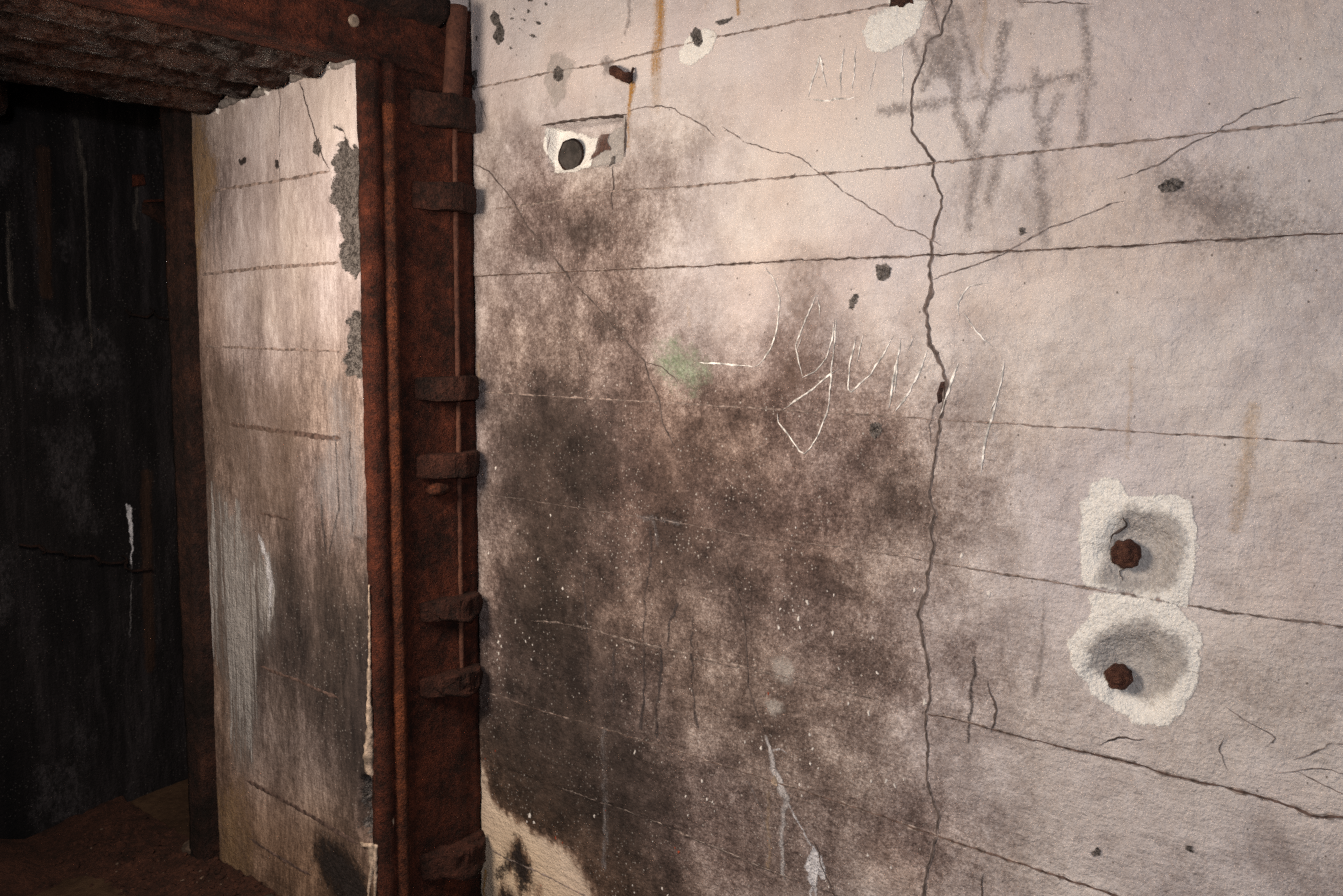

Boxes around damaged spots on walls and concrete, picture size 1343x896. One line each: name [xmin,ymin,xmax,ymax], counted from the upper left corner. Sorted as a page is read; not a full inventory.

corrosion [653,0,664,67]
crack [474,164,677,448]
crack [627,0,1343,896]
water stain [639,523,678,737]
water stain [967,657,977,743]
spalling [1067,477,1203,727]
water stain [765,736,825,896]